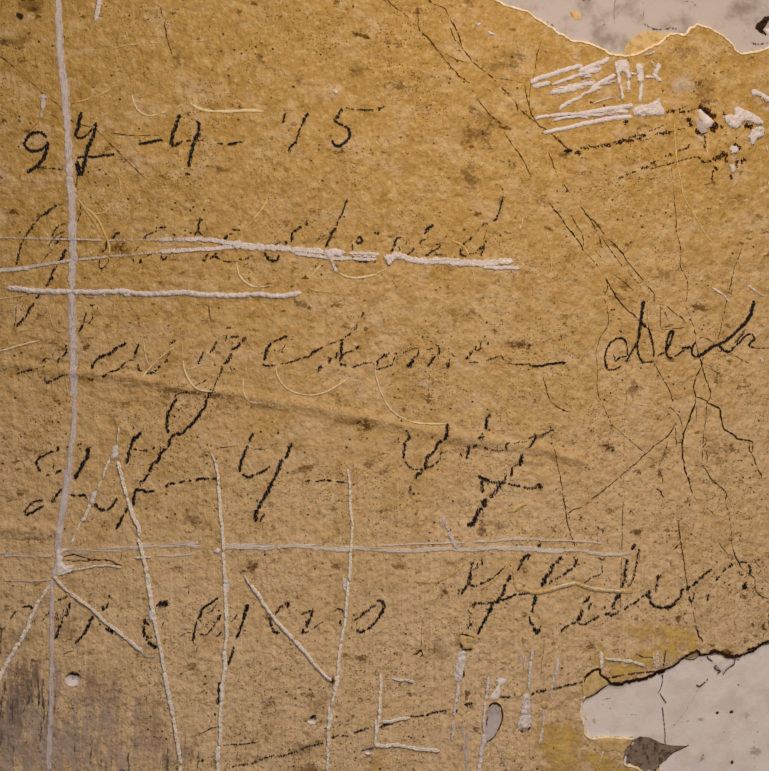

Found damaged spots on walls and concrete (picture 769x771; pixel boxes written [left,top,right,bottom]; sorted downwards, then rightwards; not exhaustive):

crack [388,0,571,192]
peeling [495,0,769,74]
crack [549,169,769,642]
peeling [580,641,769,771]